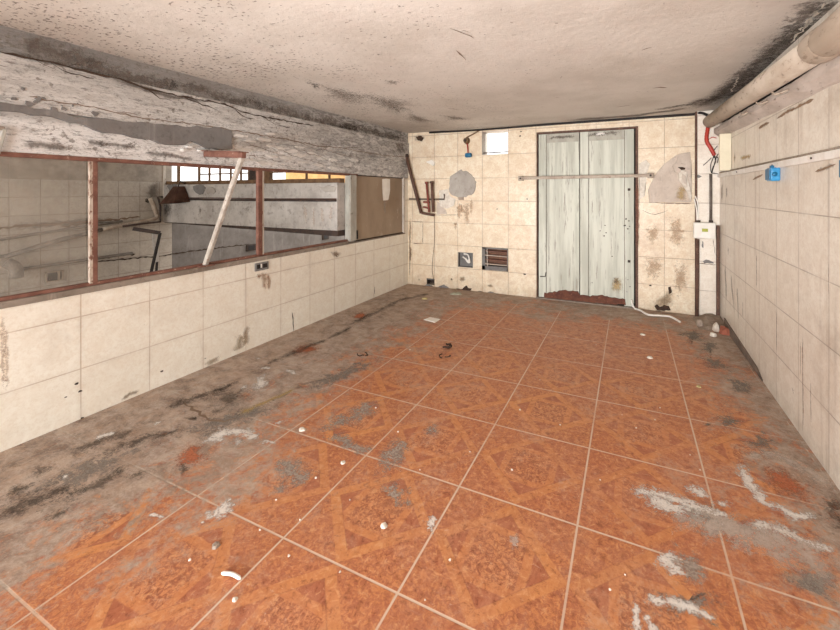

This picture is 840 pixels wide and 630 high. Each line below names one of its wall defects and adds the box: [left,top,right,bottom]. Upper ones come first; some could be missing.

spalling [0,87,361,170]
crack [0,51,403,157]
leakage [18,38,400,138]
leakage [314,86,429,122]
leakage [581,2,837,120]